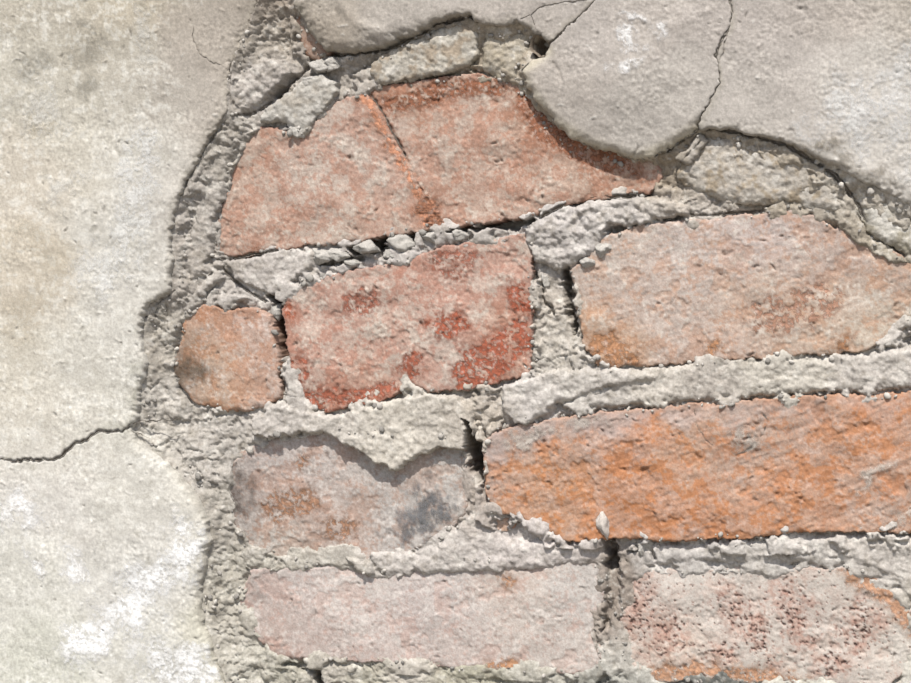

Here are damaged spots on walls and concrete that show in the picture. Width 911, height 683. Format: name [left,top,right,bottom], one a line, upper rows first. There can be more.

spalling [261,0,319,61]
spalling [517,98,911,263]
crack [723,129,864,217]
crack [664,210,763,221]
spalling [751,282,845,333]
spalling [134,15,542,683]
spalling [588,330,643,368]
spalling [707,339,724,356]
spalling [837,336,853,353]
crack [0,417,176,462]
spalling [841,569,911,637]
spalling [651,659,797,683]